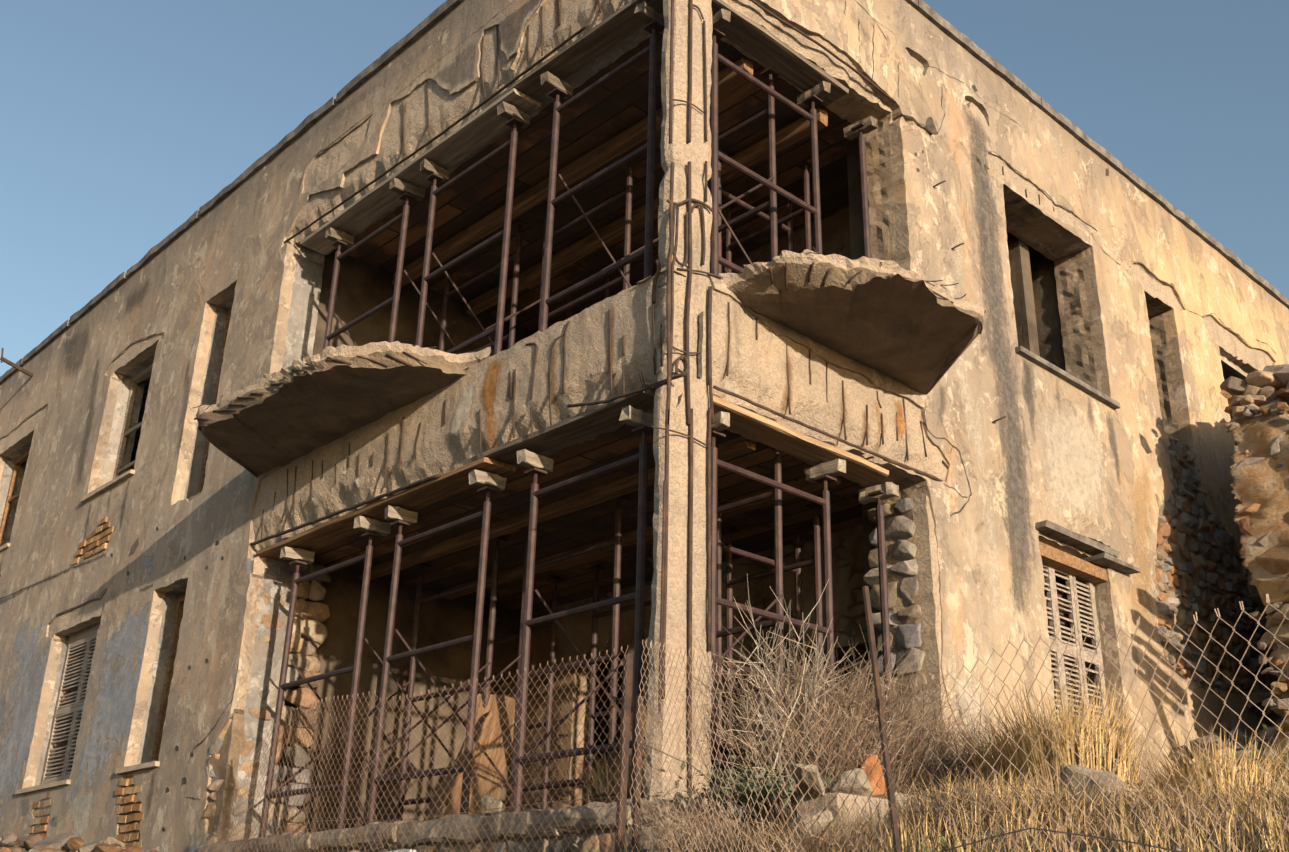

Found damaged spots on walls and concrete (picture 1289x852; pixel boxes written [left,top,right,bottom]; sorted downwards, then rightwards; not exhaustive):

spalling [284,0,632,250]
spalling [669,0,708,144]
spalling [723,0,938,172]
corrosion [483,362,501,448]
spalling [243,161,978,799]
leakage [965,109,1035,609]
leakage [1109,423,1119,481]
spalling [1155,438,1272,699]
peeling [0,593,106,838]
peeling [71,602,150,803]
spalling [115,772,144,848]
spalling [175,708,245,841]